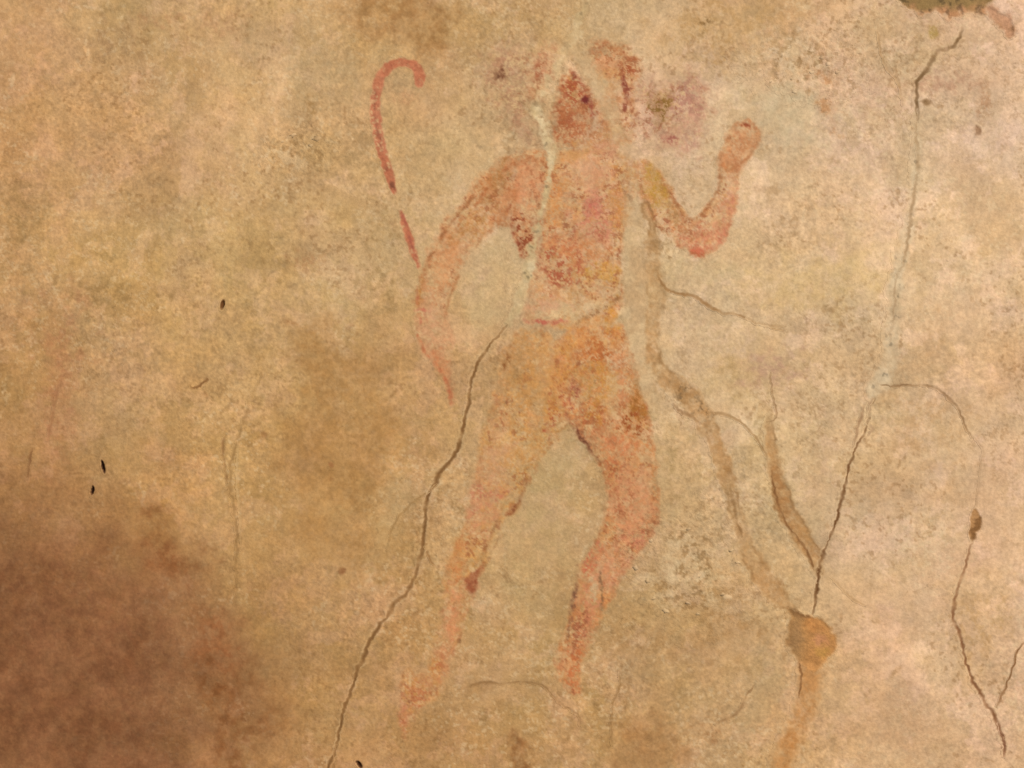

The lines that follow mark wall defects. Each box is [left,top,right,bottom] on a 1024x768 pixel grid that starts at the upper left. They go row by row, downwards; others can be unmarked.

crack [324,0,986,768]
leakage [591,690,715,768]
crack [946,540,1024,758]